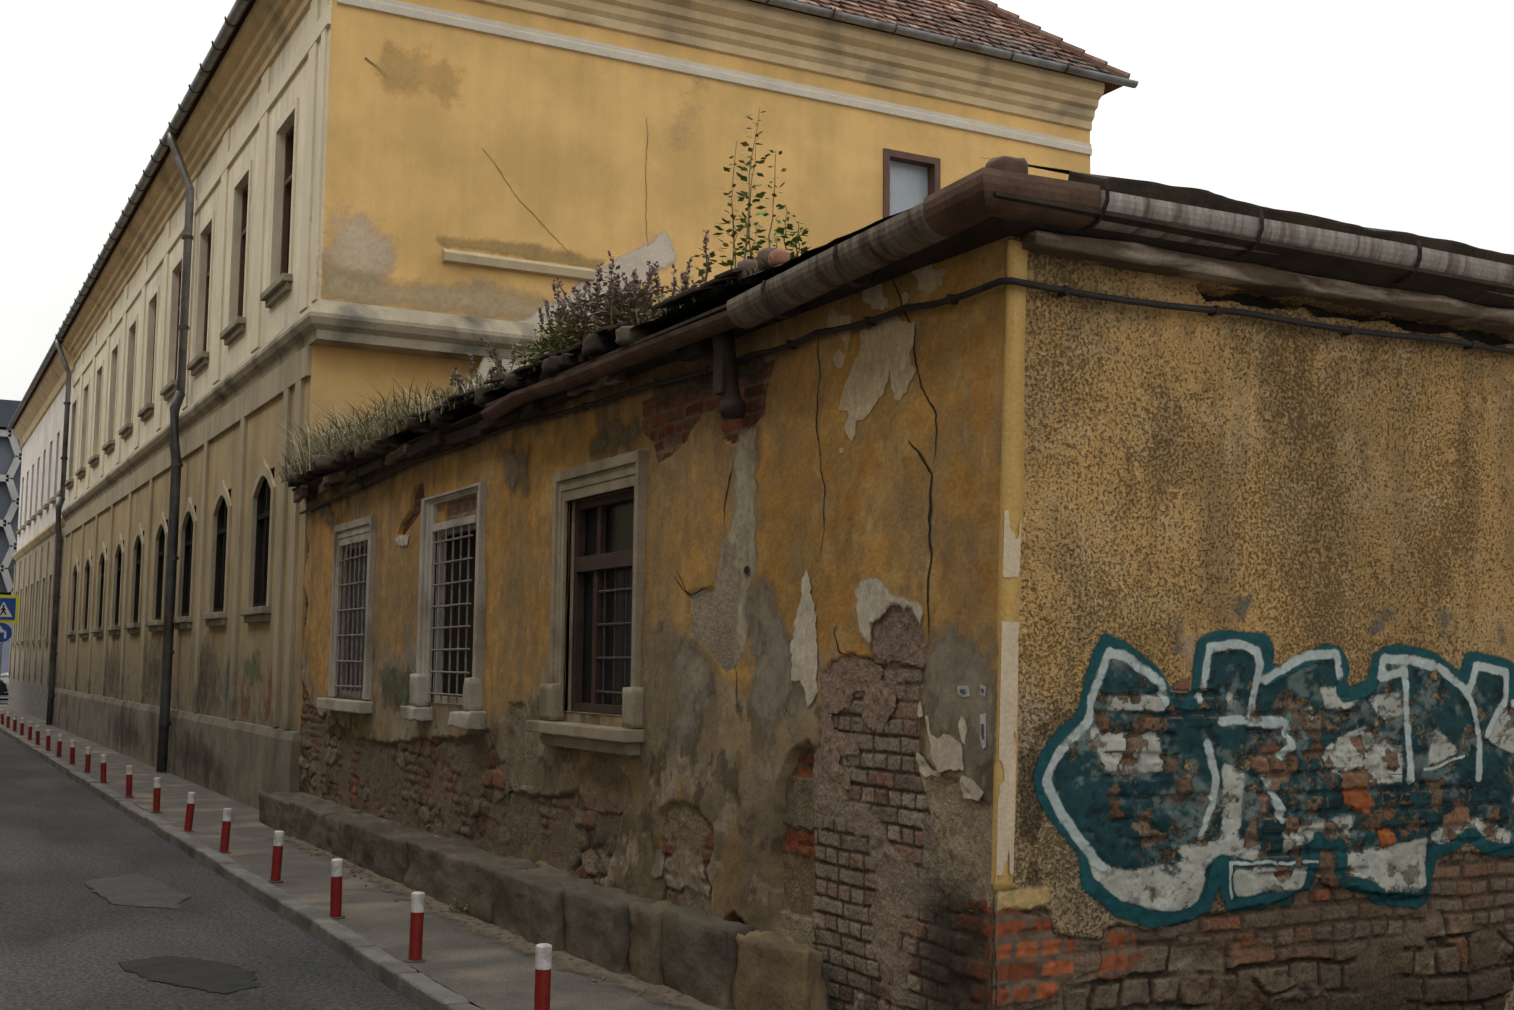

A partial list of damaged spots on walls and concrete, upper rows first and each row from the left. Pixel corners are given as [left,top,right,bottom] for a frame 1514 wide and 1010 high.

leakage [322,265,552,320]
leakage [438,237,601,270]
flaking render [641,360,775,463]
crack [816,335,825,552]
peeling [827,264,946,453]
crack [893,279,937,657]
peeling [1003,510,1021,578]
flaking render [298,682,624,886]
flaking render [780,604,1514,1010]